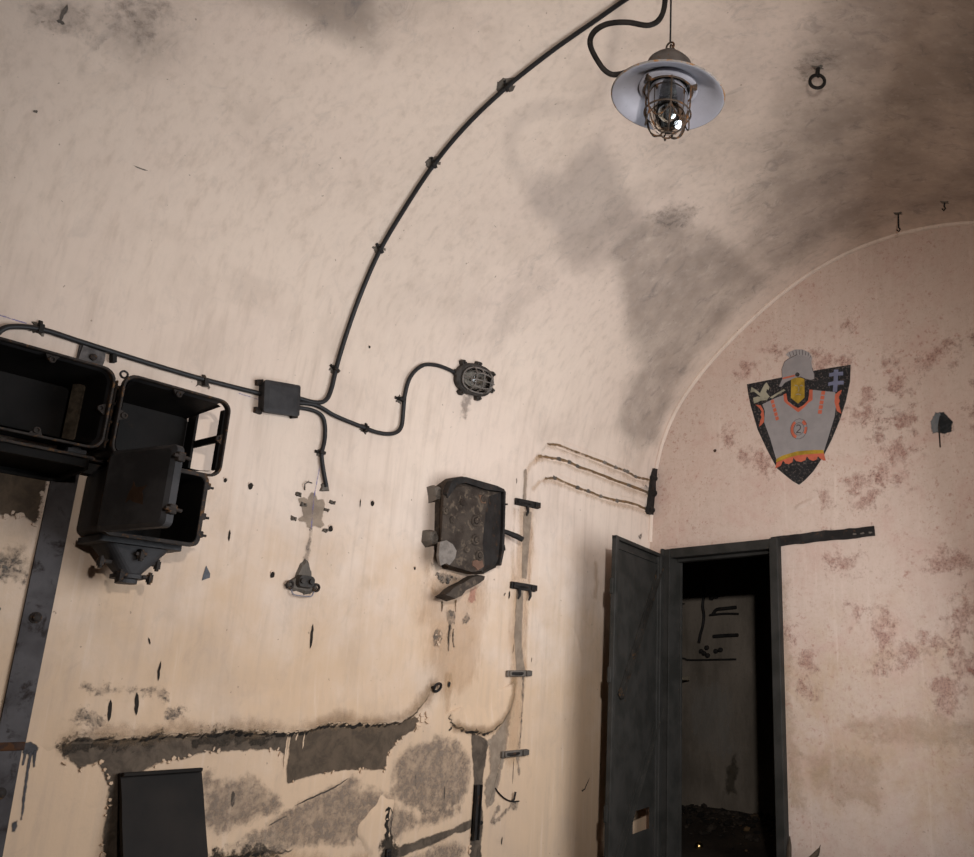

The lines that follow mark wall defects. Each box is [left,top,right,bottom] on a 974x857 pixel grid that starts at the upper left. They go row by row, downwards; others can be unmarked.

spalling [0,473,50,527]
spalling [56,711,488,857]